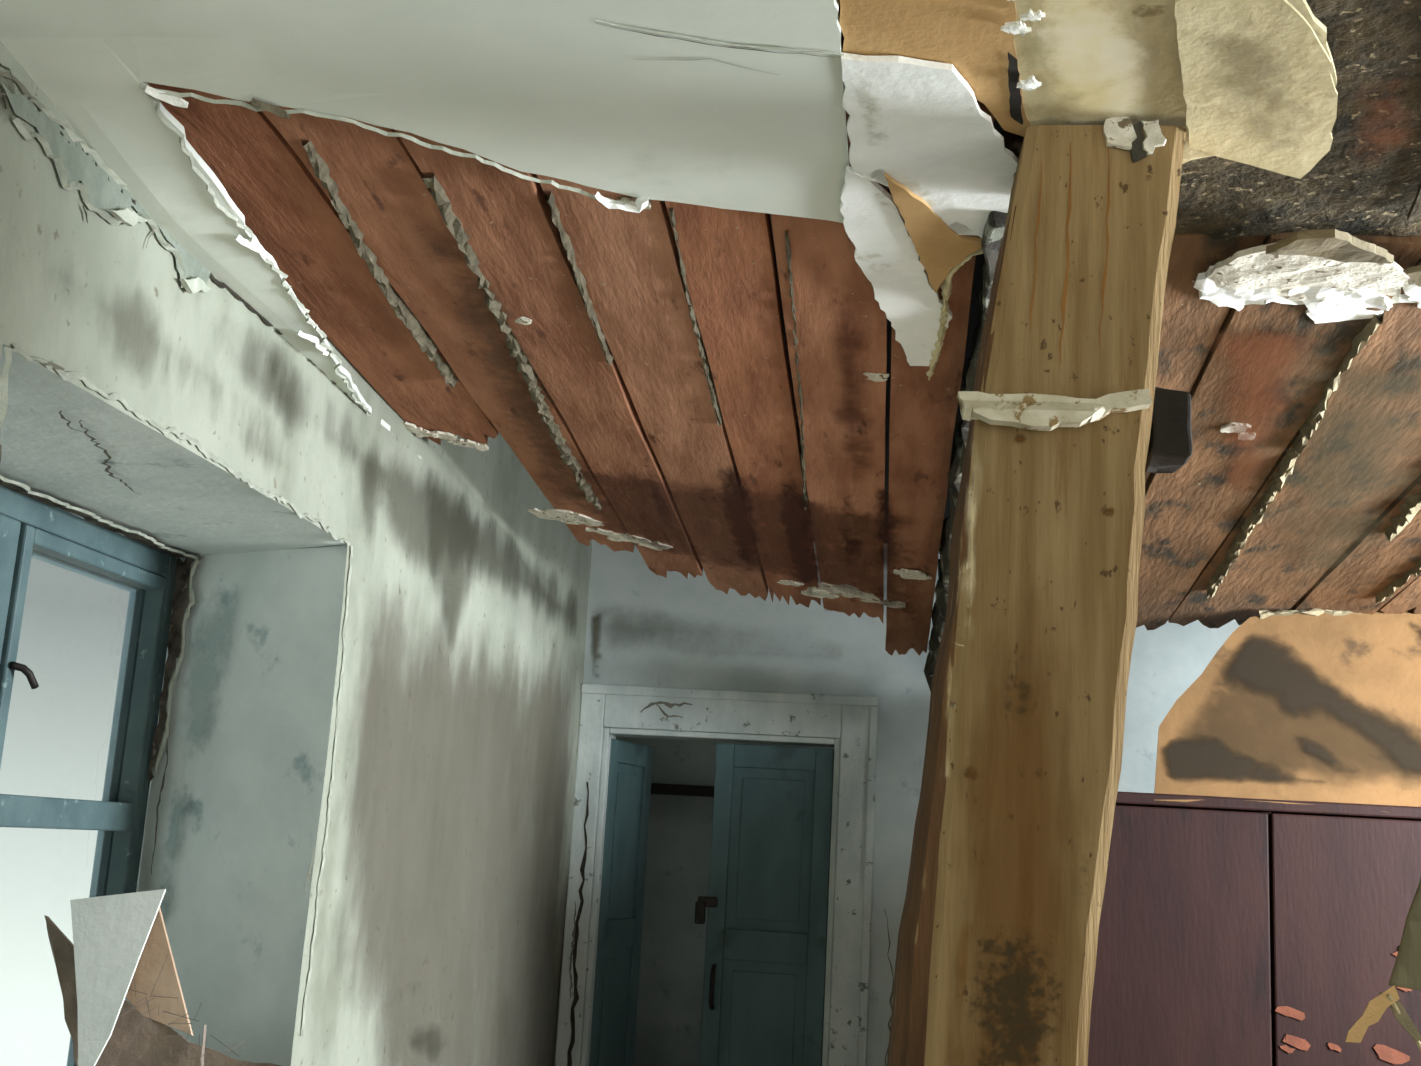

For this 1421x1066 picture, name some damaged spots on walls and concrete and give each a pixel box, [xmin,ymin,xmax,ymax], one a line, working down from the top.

crack [0,63,155,248]
peeling [2,83,211,294]
crack [210,273,283,335]
peeling [140,83,652,415]
flaking render [1193,229,1421,324]
crack [59,411,138,494]
leakage [367,468,576,635]
peeling [528,508,673,551]
leakage [720,471,757,565]
leakage [780,484,819,584]
leakage [592,616,600,659]
crack [567,782,589,1066]